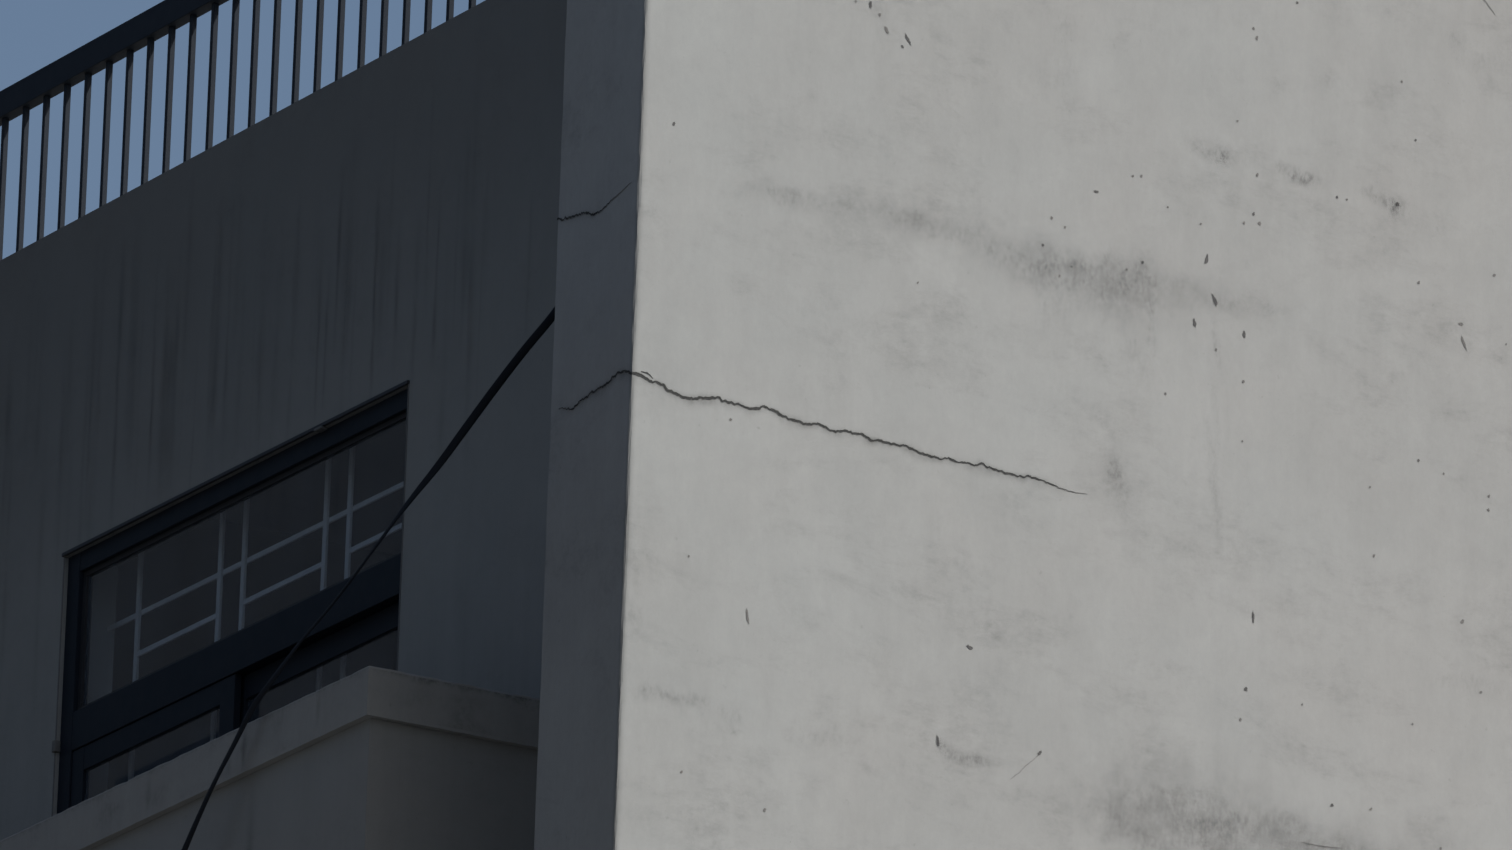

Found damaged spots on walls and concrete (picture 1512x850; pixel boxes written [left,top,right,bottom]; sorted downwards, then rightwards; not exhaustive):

crack [557,183,630,221]
crack [562,370,1086,494]